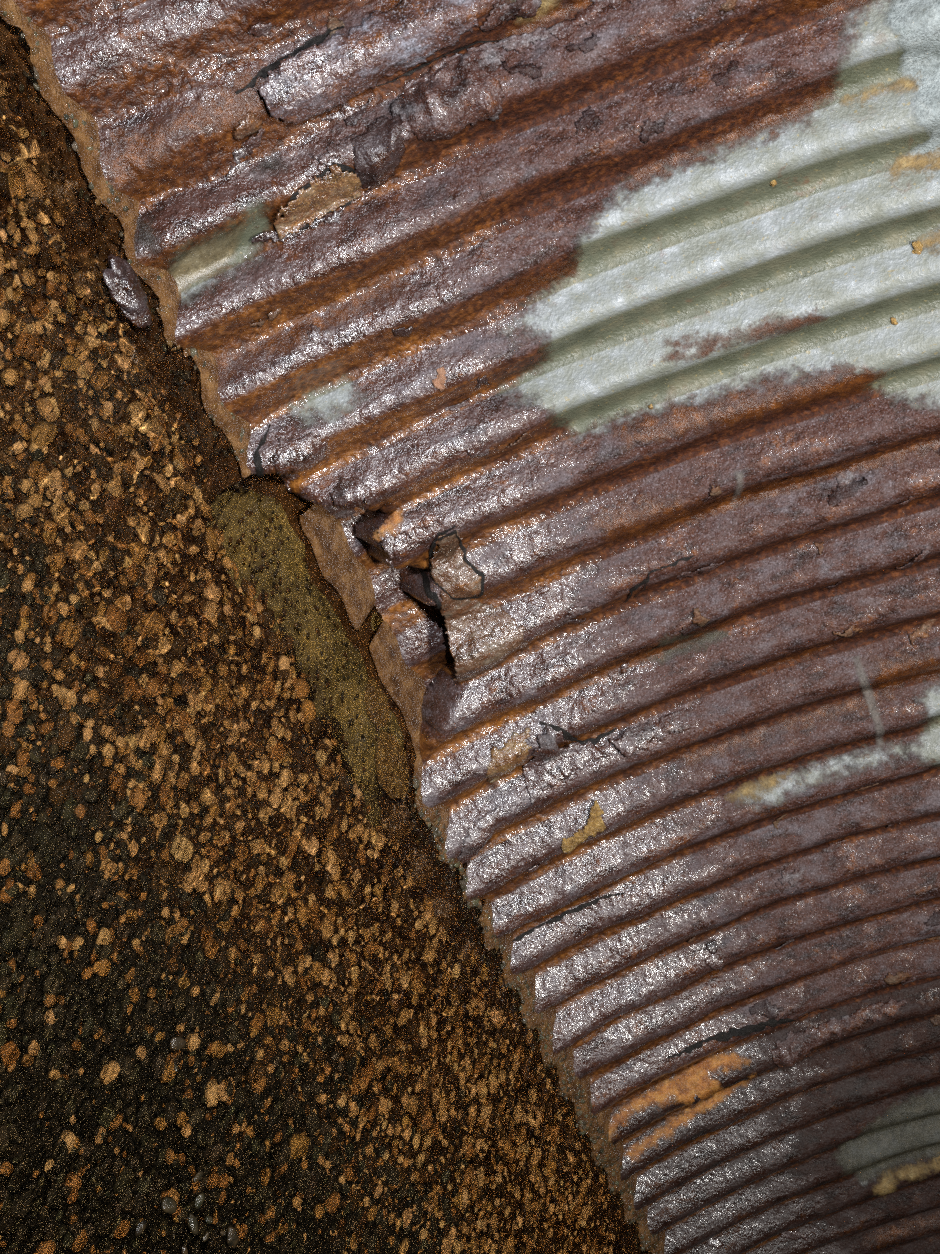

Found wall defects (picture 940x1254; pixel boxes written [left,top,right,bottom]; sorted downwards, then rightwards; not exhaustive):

crack [236,25,344,94]
rust [666,314,826,361]
rust [649,402,690,427]
rust [690,365,856,415]
rust [594,454,887,540]
crack [417,525,456,612]
rust [872,653,940,689]
rust [486,727,532,783]
rust [522,724,608,805]
rust [457,803,501,864]
rust [561,800,606,854]
rust [609,978,940,1254]